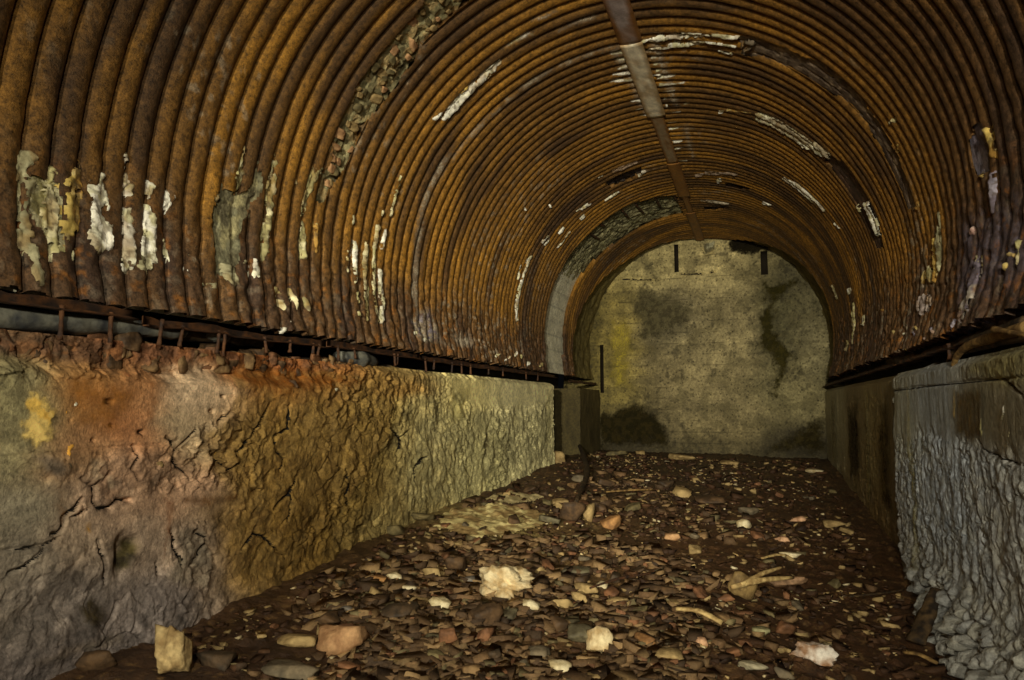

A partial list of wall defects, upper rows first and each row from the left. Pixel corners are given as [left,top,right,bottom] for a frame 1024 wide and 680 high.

peeling [432,59,502,121]
spalling [641,32,920,212]
peeling [16,149,175,287]
peeling [202,145,278,288]
peeling [346,175,402,324]
damp [760,280,798,397]
crack [166,413,228,471]
crack [214,407,296,519]
damp [600,405,667,447]
crack [14,485,123,570]
crack [155,533,205,572]
crack [242,532,276,550]